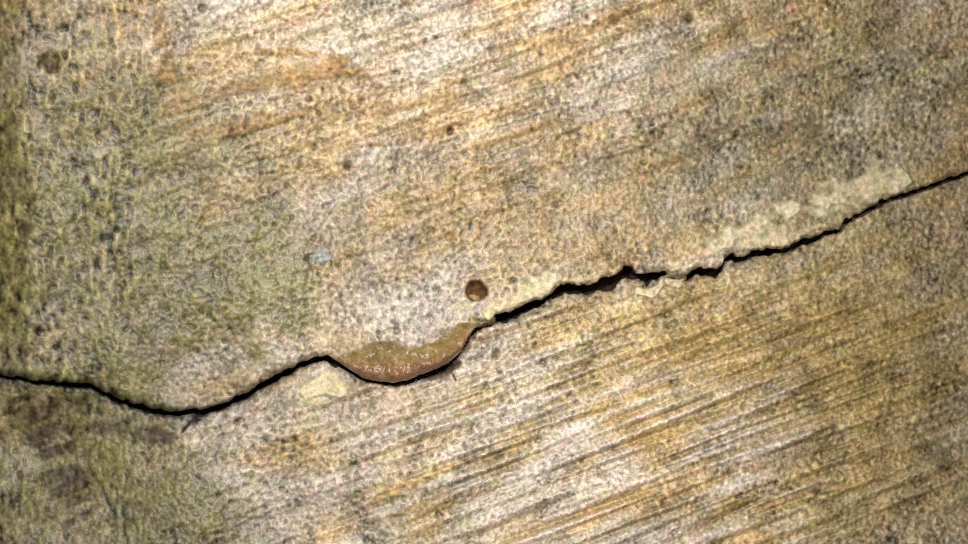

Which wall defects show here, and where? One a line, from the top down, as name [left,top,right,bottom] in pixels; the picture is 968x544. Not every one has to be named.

crack [0,171,968,433]